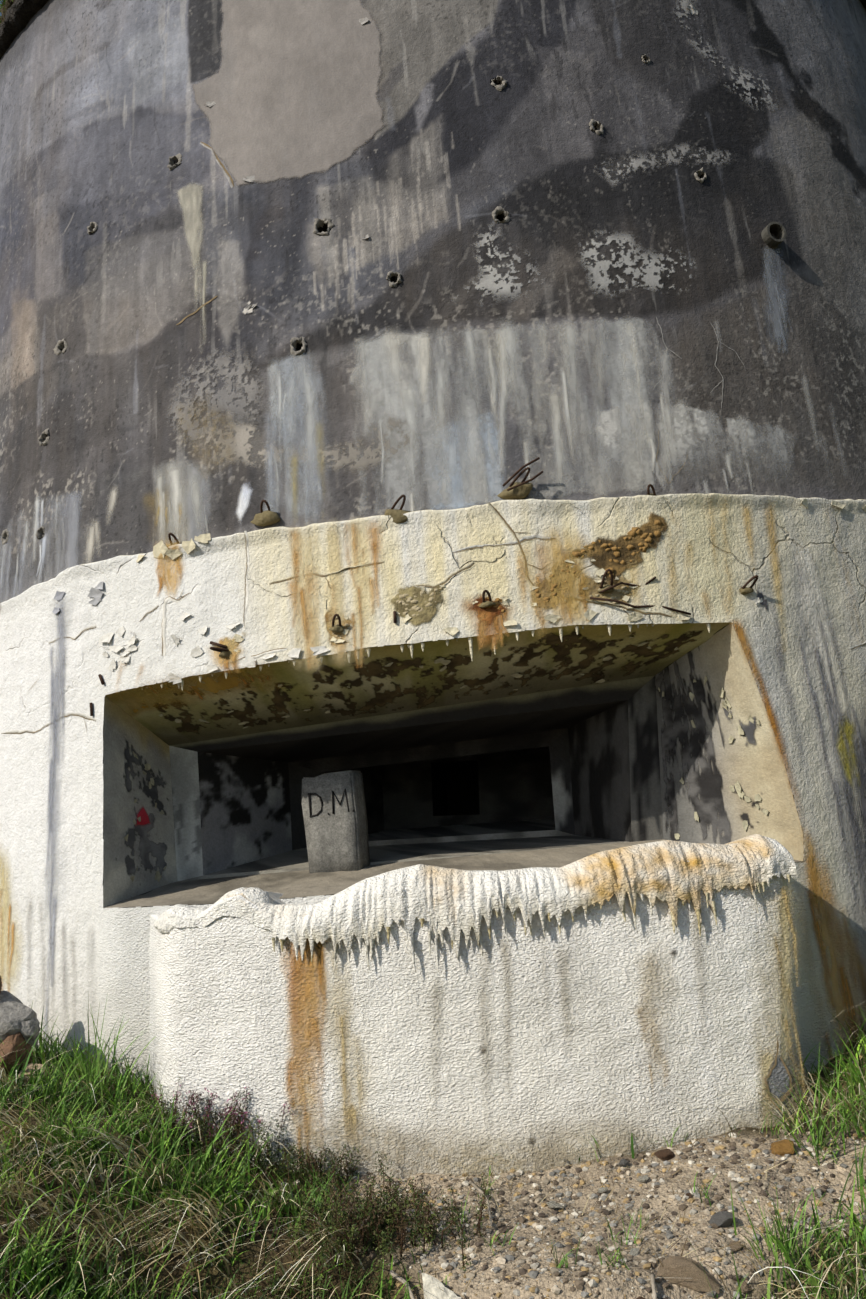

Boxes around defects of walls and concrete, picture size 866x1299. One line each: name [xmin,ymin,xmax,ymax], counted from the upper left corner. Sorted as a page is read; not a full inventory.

peeling [192,0,385,185]
leakage [49,614,64,807]
peeling [99,626,138,671]
leakage [237,486,251,519]
leakage [170,326,529,514]
corrosion [328,528,377,653]
peeling [136,512,769,844]
leakage [550,319,789,495]
corrosion [734,624,756,676]
corrosion [763,693,785,761]
leakage [159,834,797,974]
corrosion [777,890,805,1094]